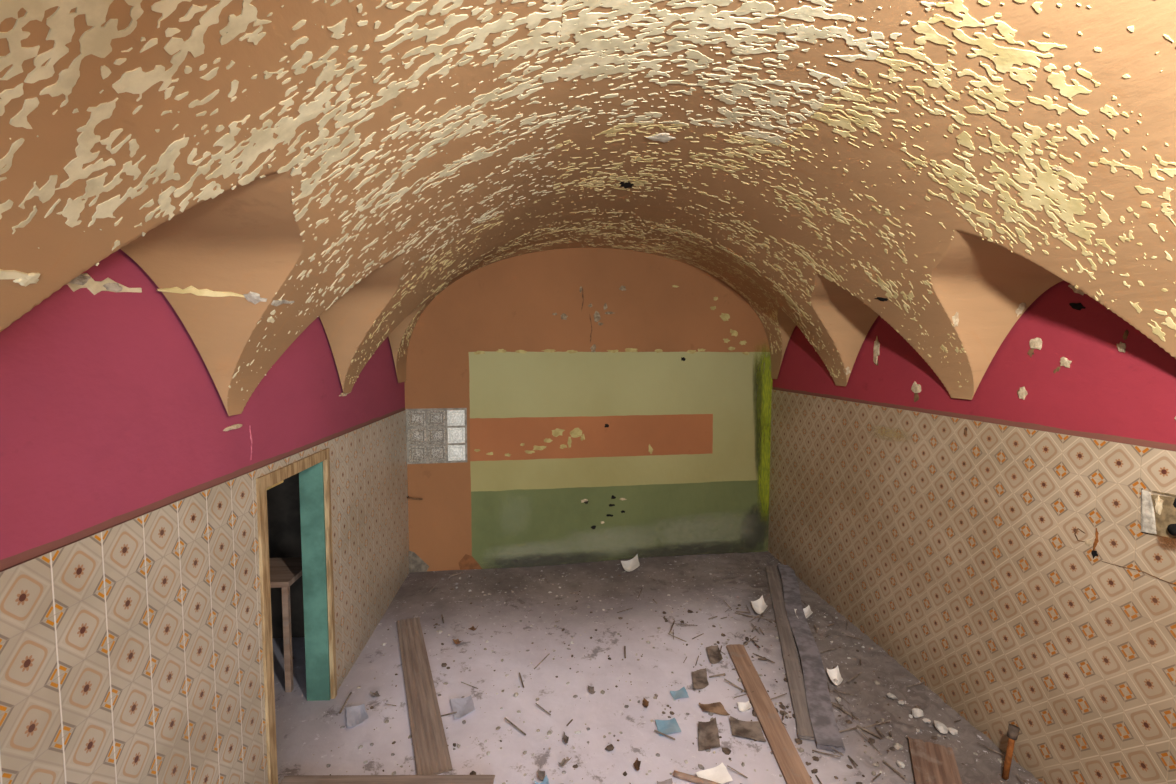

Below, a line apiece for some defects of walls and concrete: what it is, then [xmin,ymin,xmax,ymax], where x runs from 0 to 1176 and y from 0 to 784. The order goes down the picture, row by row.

peeling [0,0,1176,396]
crack [0,269,294,323]
spalling [911,381,921,402]
peeling [474,428,585,457]